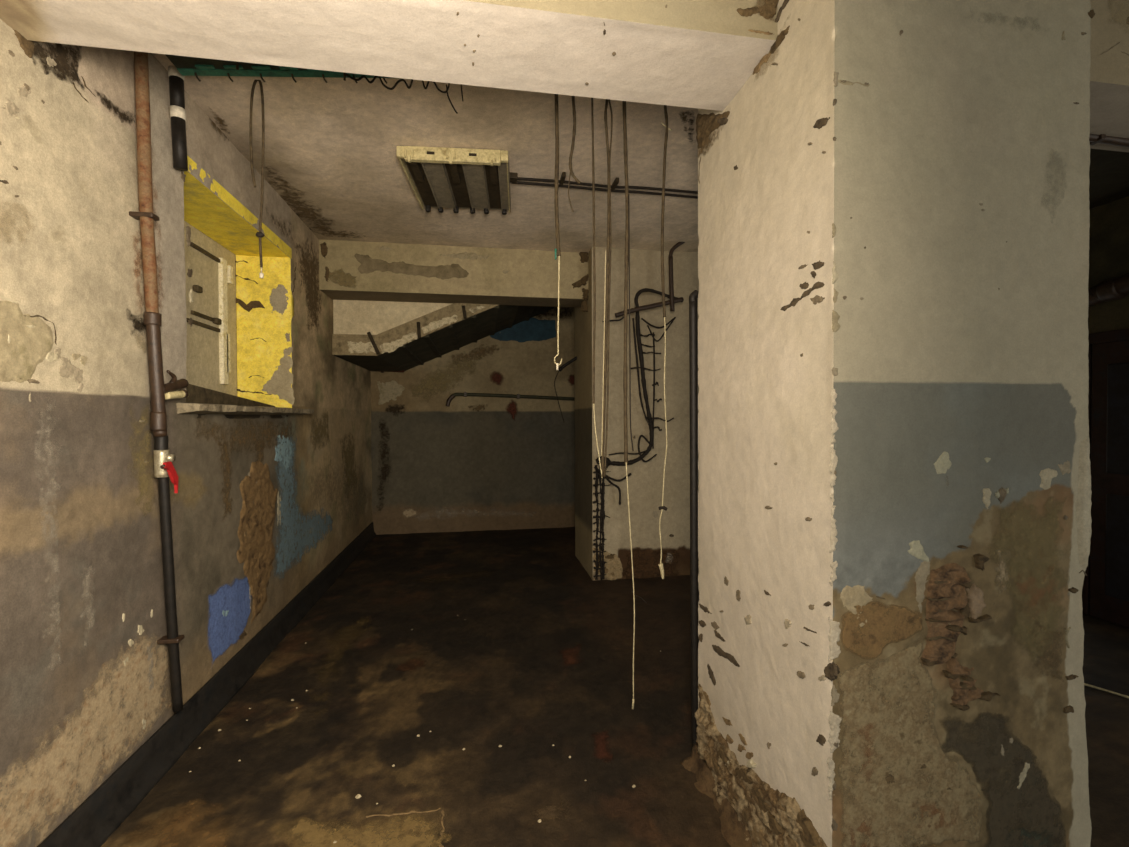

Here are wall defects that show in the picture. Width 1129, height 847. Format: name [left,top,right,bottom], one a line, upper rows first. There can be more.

damp [8,29,132,124]
spalling [737,0,801,75]
peeling [269,284,289,315]
spalling [780,260,864,332]
peeling [0,296,88,402]
peeling [262,333,295,405]
peeling [1039,460,1071,490]
spalling [208,435,333,661]
peeling [694,367,1066,847]
damp [0,609,172,847]